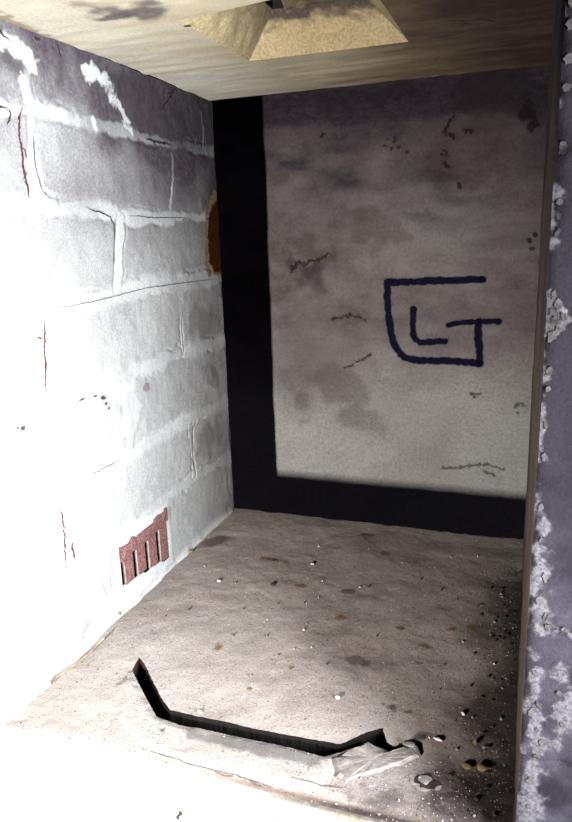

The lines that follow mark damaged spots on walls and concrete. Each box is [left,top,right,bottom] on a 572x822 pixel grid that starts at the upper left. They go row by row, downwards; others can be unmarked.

leakage [3,53,36,144]
crack [0,106,53,202]
rust [205,189,222,278]